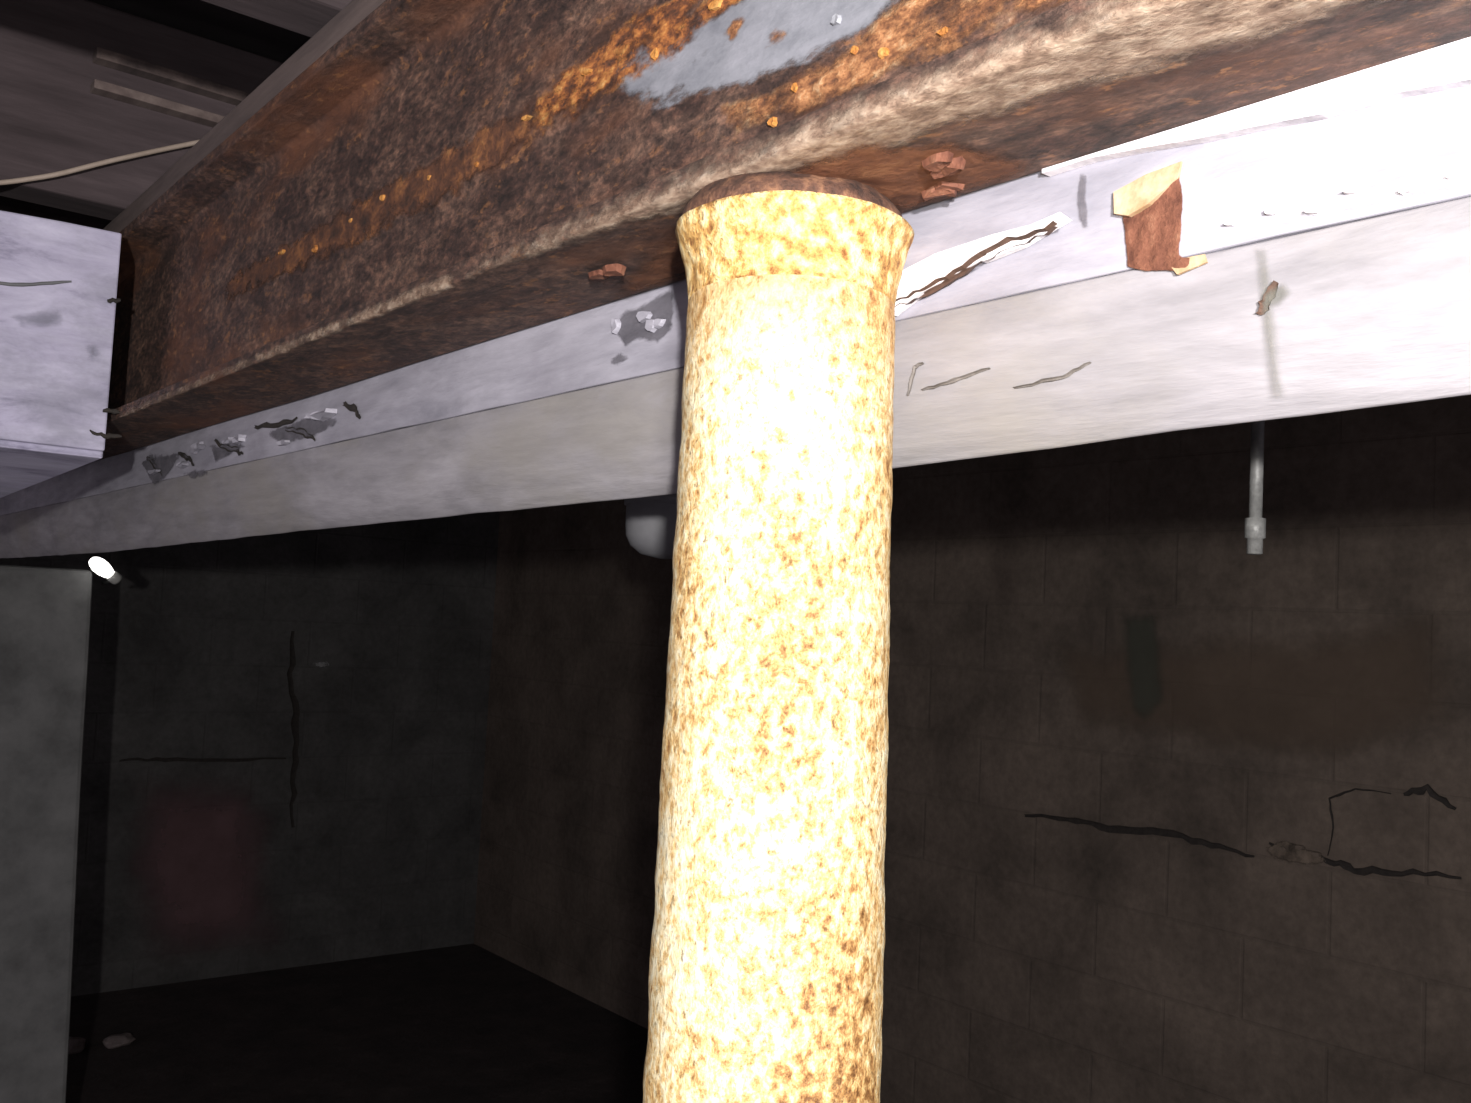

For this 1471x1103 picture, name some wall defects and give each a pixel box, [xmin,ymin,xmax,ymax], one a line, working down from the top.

peeling [620,0,890,107]
rust [225,0,740,301]
rust [530,0,1349,254]
peeling [895,176,1087,316]
spalling [1113,161,1208,275]
rust [167,277,451,398]
peeling [611,293,673,363]
peeling [142,401,361,484]
crack [1024,814,1274,858]
crack [1308,784,1462,879]